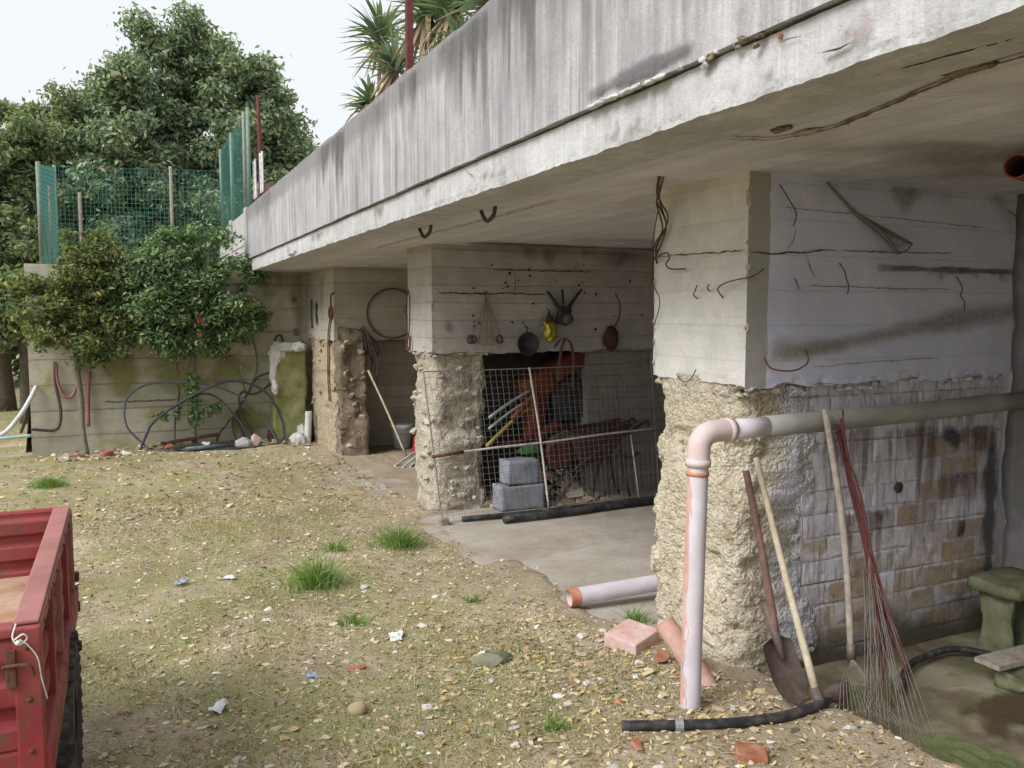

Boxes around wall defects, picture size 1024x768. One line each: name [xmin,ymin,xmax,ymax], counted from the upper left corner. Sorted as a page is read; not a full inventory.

spalling [698,48,720,71]
spalling [732,33,765,50]
peeling [585,65,683,110]
crack [730,38,1024,141]
crack [660,206,985,290]
leakage [890,266,1011,277]
spalling [310,327,371,456]
spalling [652,356,688,391]
spalling [719,373,1008,401]
spalling [410,390,435,481]
leakage [943,427,961,447]
leakage [983,436,997,571]